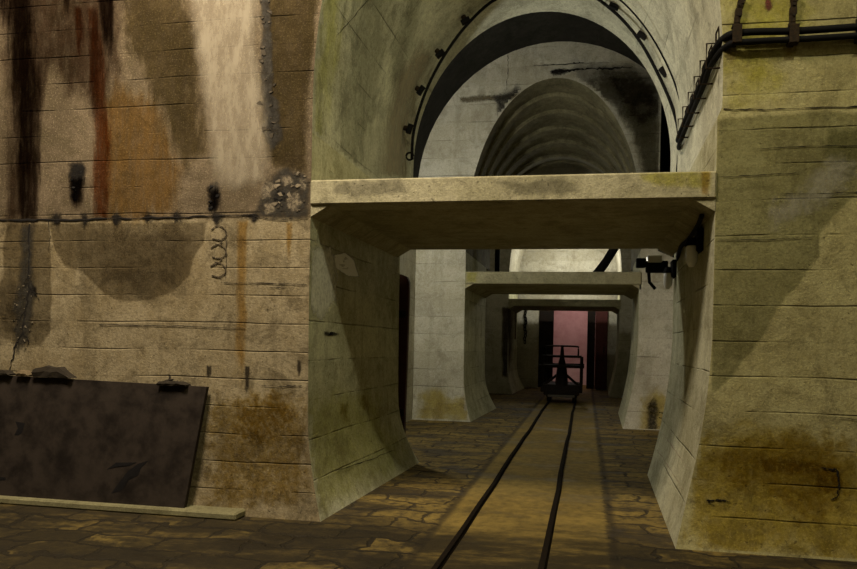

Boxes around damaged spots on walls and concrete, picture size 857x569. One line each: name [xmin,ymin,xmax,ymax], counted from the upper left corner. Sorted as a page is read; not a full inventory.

leakage [0,0,116,351]
corrosion [76,8,109,214]
leakage [197,0,282,183]
peeling [258,168,309,217]
crack [0,214,306,370]
leakage [647,401,658,429]